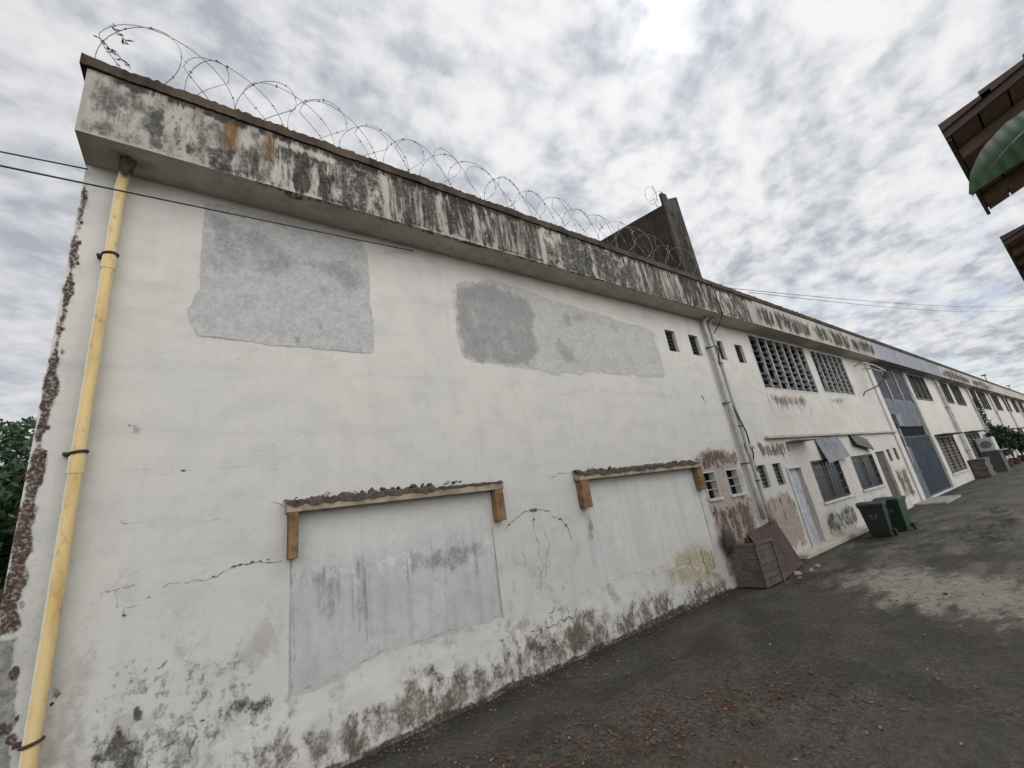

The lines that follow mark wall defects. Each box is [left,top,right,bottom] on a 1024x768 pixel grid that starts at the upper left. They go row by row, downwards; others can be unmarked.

leakage [93,78,875,364]
flaking render [0,186,87,768]
crack [508,508,577,652]
peeling [572,449,761,576]
peeling [768,494,806,547]
leakage [92,716,219,768]
leakage [220,697,271,722]
leakage [245,552,732,768]